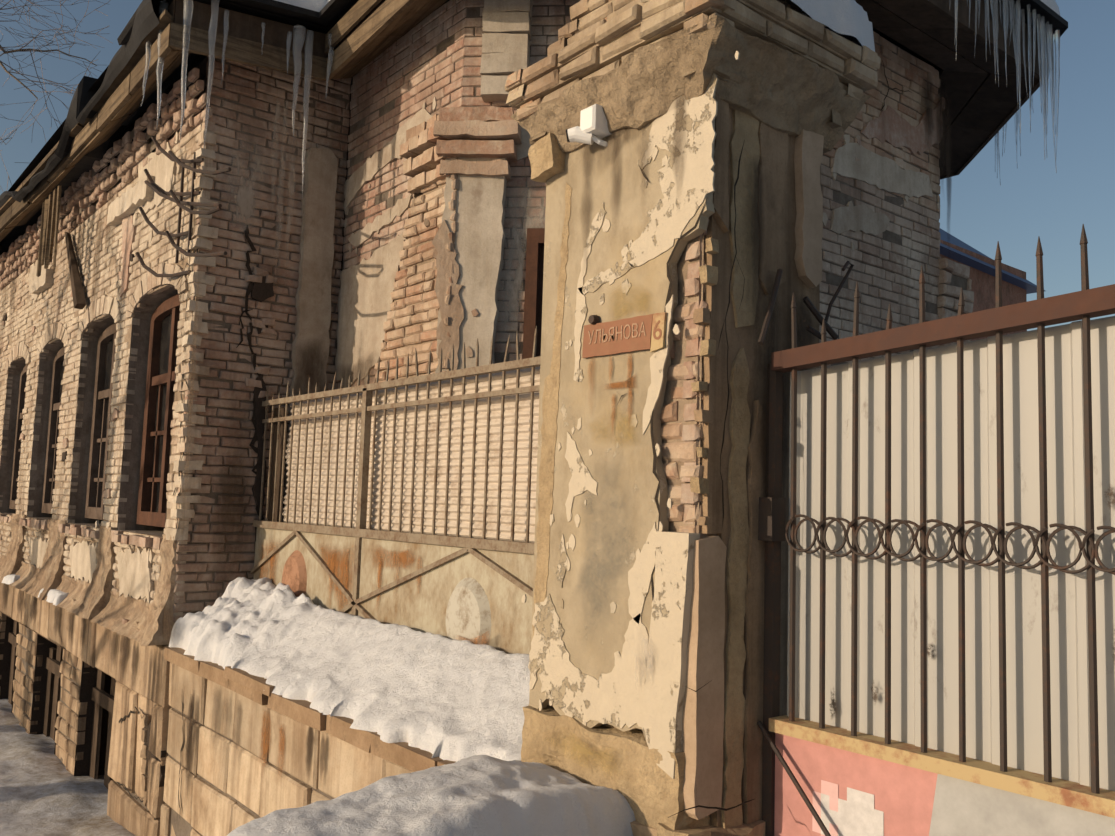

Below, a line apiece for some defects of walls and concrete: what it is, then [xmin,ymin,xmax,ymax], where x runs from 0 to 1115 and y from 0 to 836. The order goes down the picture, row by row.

crack [236,225,266,541]
spalling [522,73,719,728]
rust [323,551,351,603]
crack [668,788,754,829]